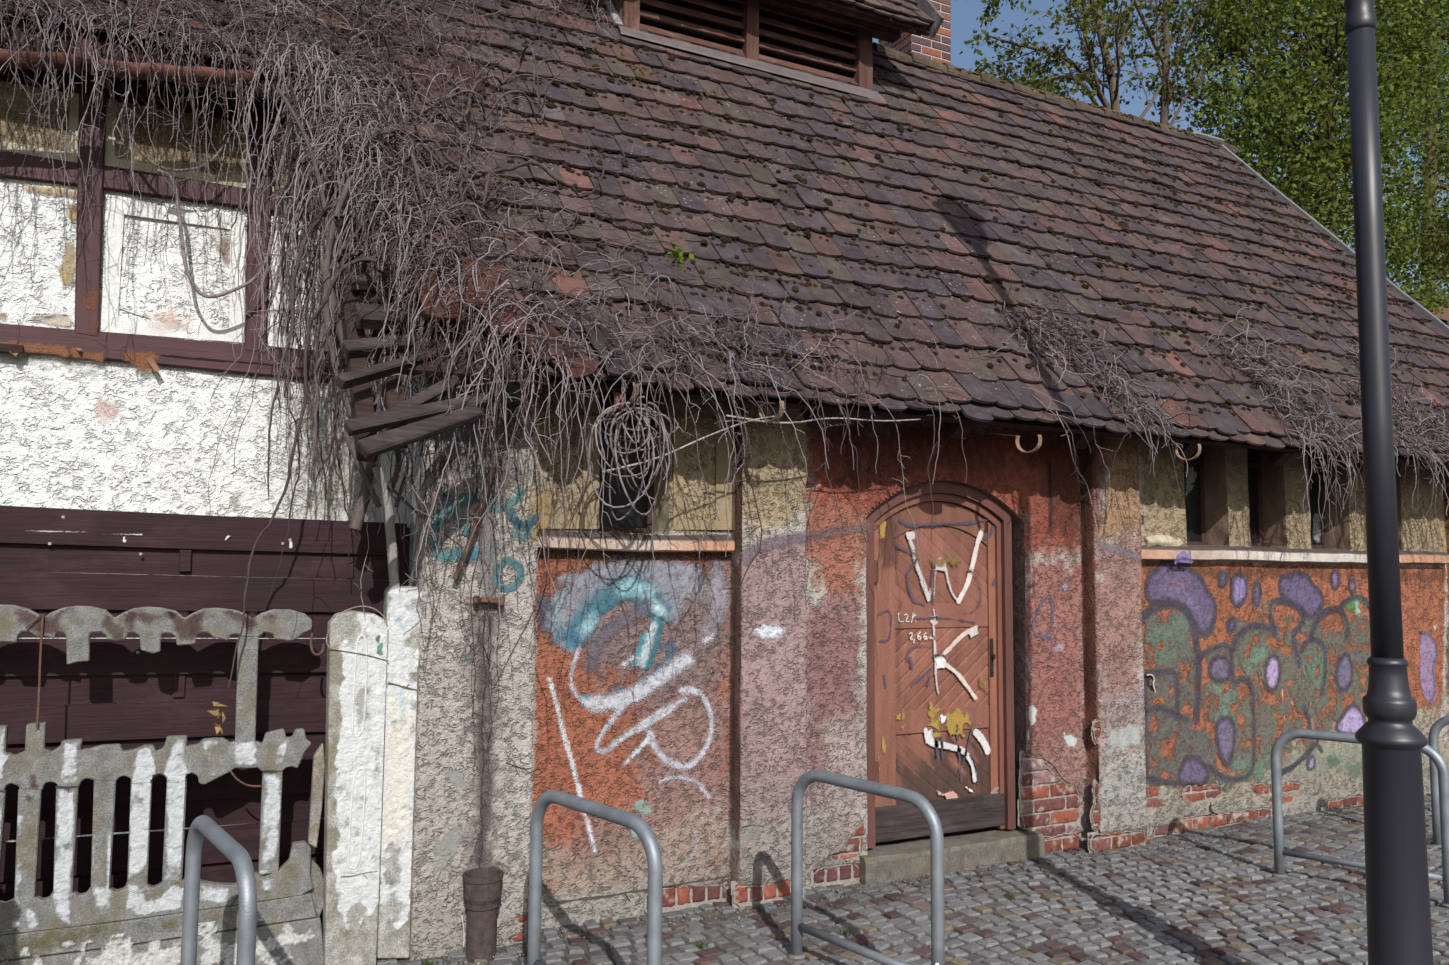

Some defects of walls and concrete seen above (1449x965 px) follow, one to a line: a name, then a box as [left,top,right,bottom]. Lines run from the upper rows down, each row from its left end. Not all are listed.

peeling [60,242,75,285]
peeling [0,341,103,361]
peeling [124,350,161,372]
peeling [0,728,8,779]
peeling [331,587,422,930]
flaking render [1017,706,1302,854]
peeling [52,742,80,924]
peeling [93,739,229,926]
peeling [203,741,287,890]
flaking render [810,821,865,888]
peeling [12,865,39,929]
flaking render [644,880,791,914]